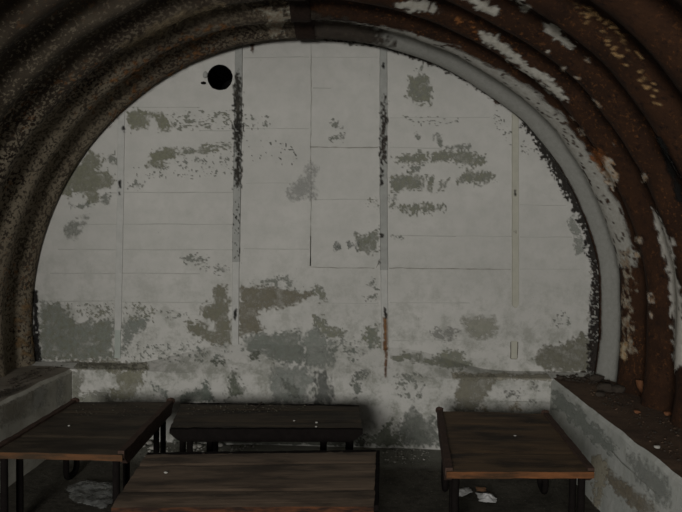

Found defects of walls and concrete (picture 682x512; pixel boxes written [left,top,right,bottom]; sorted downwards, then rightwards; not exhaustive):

peeling [387,48,466,106]
peeling [62,150,117,209]
peeling [126,109,232,132]
damp [232,73,244,190]
damp [379,96,388,185]
peeling [390,133,495,216]
spalling [519,122,599,373]
peeling [658,216,682,369]
damp [38,302,149,402]
damp [270,327,335,405]
damp [452,331,591,412]
damp [353,407,440,448]